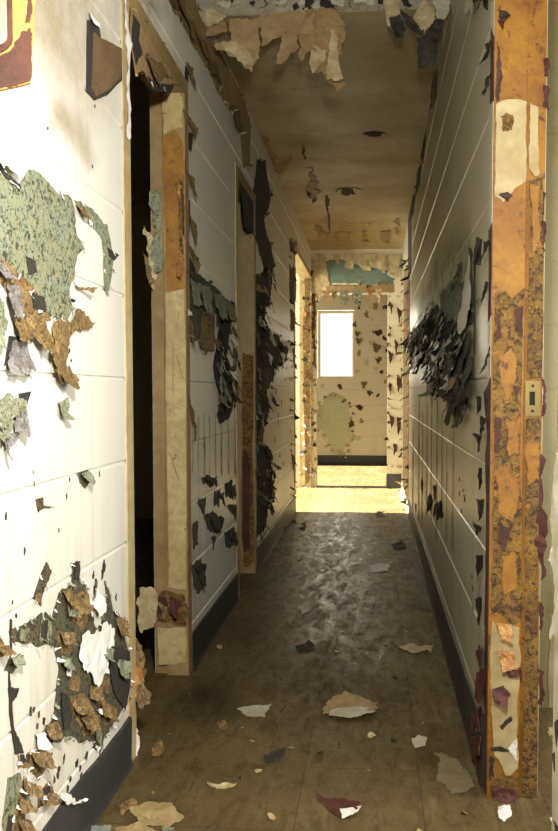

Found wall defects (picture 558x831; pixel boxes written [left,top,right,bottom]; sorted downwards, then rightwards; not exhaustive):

peeling [86,0,198,140]
peeling [0,146,119,390]
peeling [143,189,164,290]
peeling [0,391,31,461]
peeling [59,397,75,420]
peeling [165,0,550,821]
peeling [0,559,158,831]
peeling [535,452,558,831]